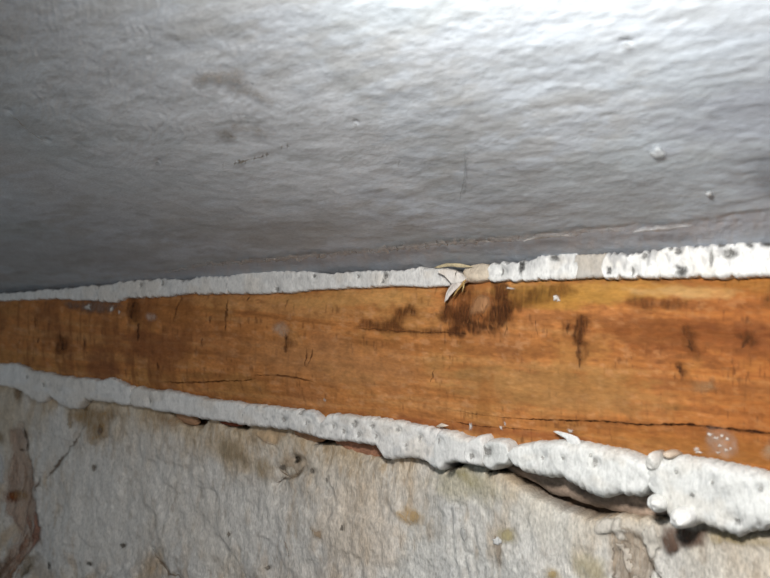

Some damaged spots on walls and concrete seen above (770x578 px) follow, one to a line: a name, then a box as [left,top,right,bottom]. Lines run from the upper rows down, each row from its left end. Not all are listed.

crack [34,428,83,492]
spalling [0,427,40,578]
spalling [613,529,649,578]